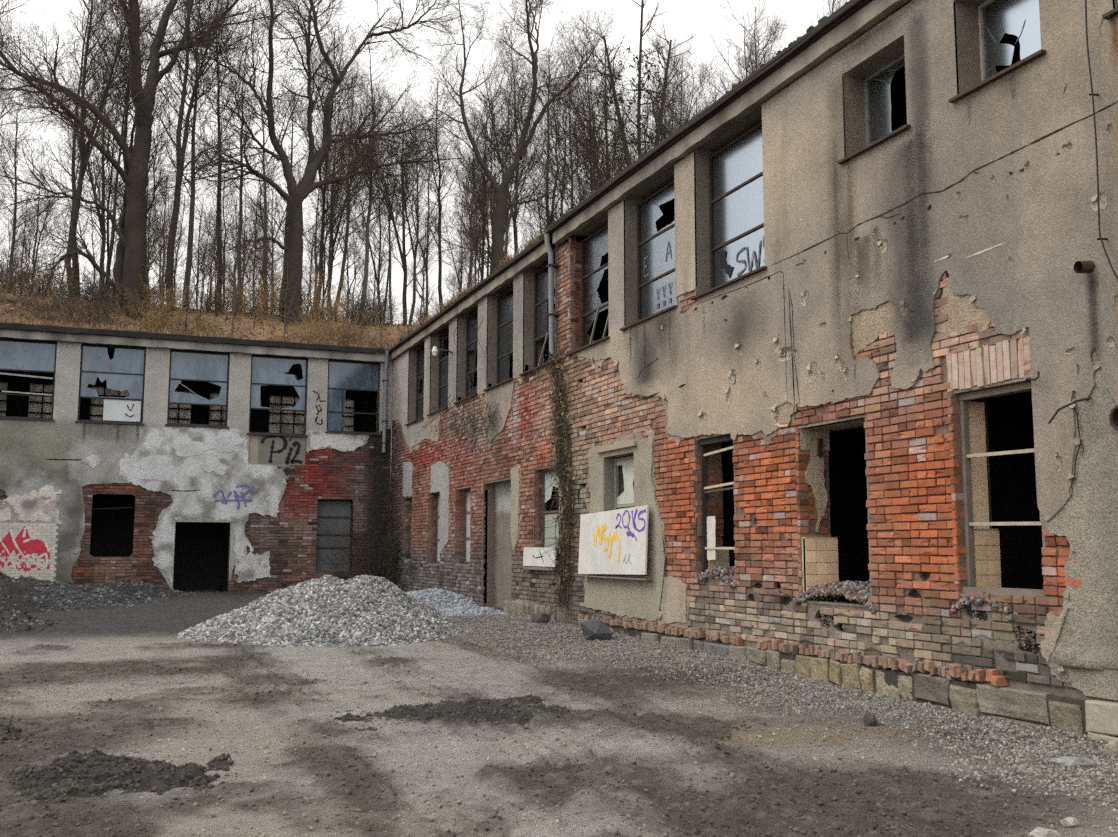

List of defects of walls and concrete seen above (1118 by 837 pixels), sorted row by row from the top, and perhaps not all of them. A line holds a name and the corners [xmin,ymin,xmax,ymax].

peeling [0,485,62,524]
flaking render [71,244,1118,700]
crack [1069,393,1083,494]